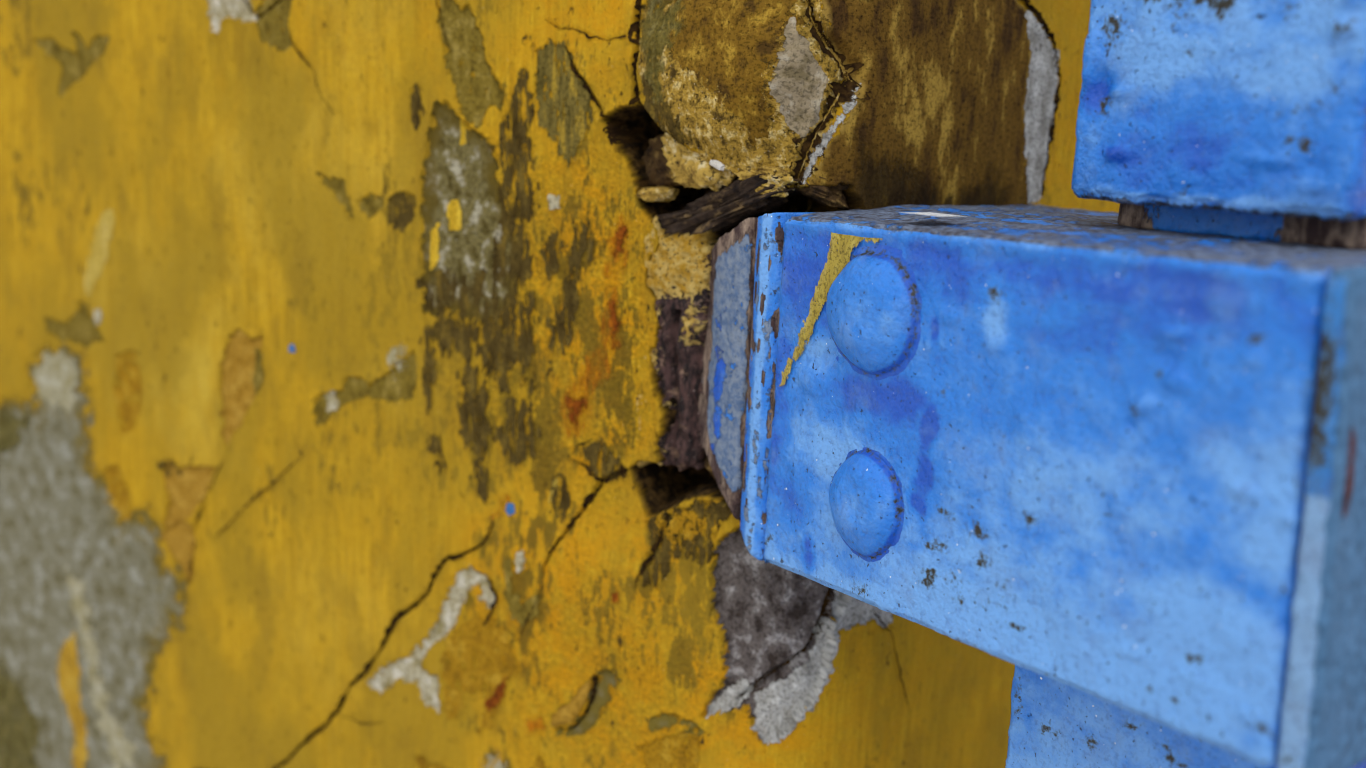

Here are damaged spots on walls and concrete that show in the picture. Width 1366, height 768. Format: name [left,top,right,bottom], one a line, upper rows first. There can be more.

spalling [207,0,292,52]
crack [256,0,334,115]
flaking render [636,0,847,189]
damp [416,35,596,504]
peeling [312,346,417,426]
flaking render [0,209,215,768]
crack [188,448,303,585]
crack [275,521,497,768]
flaking render [367,550,540,735]
crack [518,439,628,640]
crack [634,473,705,588]
flaking render [640,499,893,745]